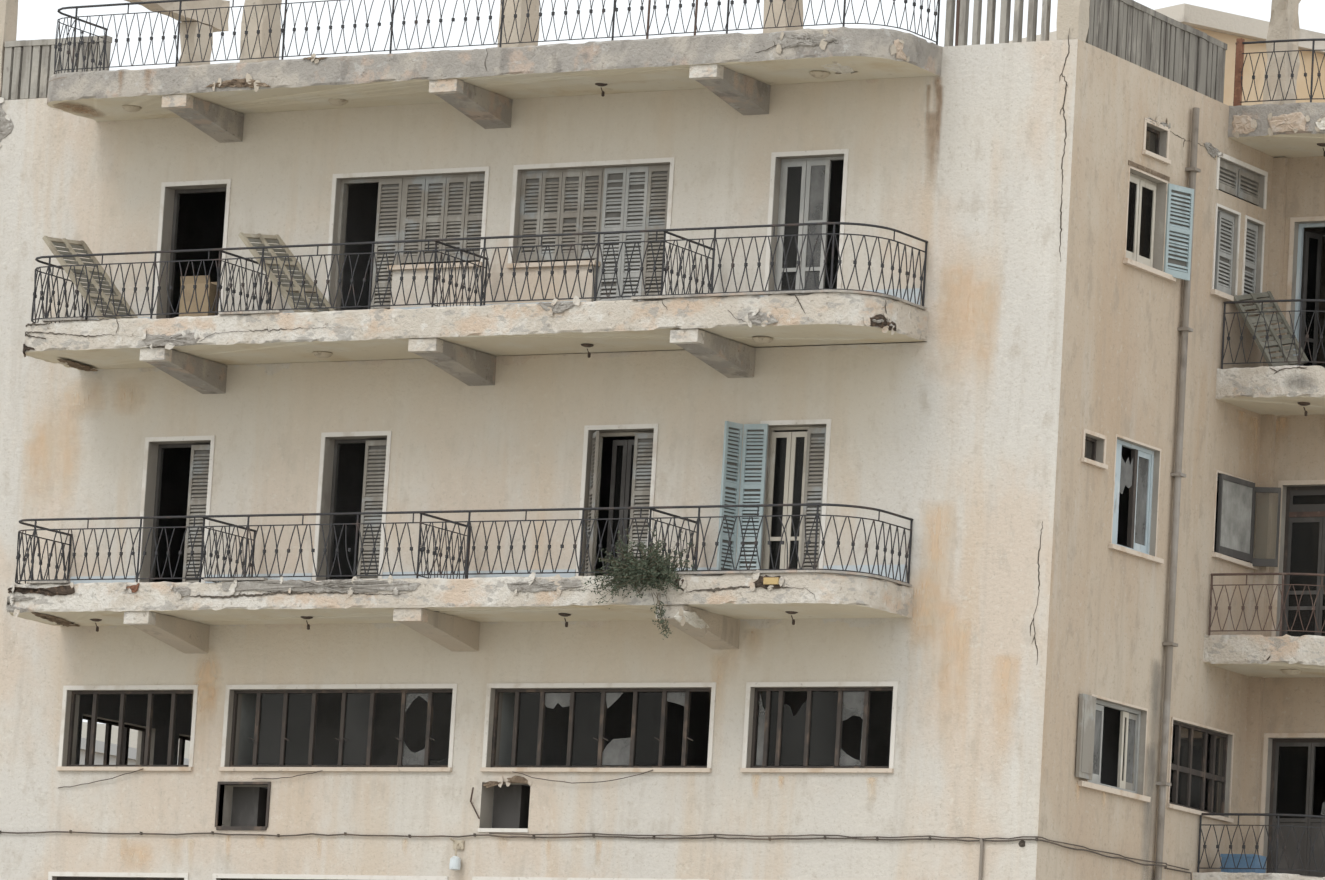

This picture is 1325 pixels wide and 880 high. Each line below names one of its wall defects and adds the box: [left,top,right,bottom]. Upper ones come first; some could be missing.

spalling [0,97,14,147]
flaking render [1232,112,1325,138]
crack [1059,29,1070,262]
spalling [1203,142,1223,160]
flaking render [748,307,779,327]
spalling [863,313,898,335]
flaking render [141,329,199,350]
spalling [123,583,140,593]
flaking render [222,575,420,596]
flaking render [507,572,582,595]
crack [1030,521,1043,661]
spalling [6,582,80,627]